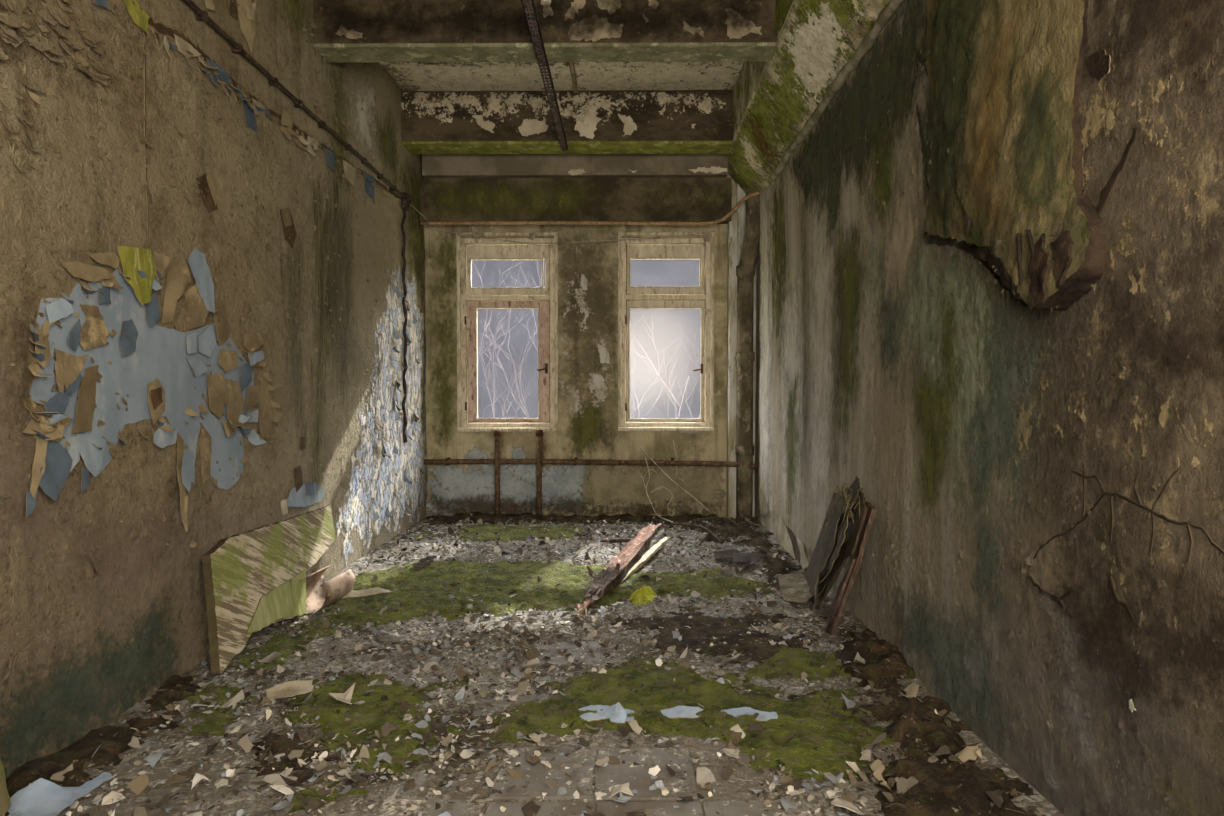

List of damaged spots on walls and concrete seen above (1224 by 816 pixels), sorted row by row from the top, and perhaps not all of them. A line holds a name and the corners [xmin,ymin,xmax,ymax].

peeling [380,61,744,139]
peeling [565,0,623,42]
peeling [690,166,727,174]
crack [1096,123,1140,215]
water stain [1090,0,1224,97]
peeling [22,246,282,533]
peeling [328,260,725,567]
water stain [560,241,612,453]
water stain [758,109,1046,613]
crack [1026,465,1224,613]
water stain [897,586,1014,751]
water stain [1054,573,1224,707]